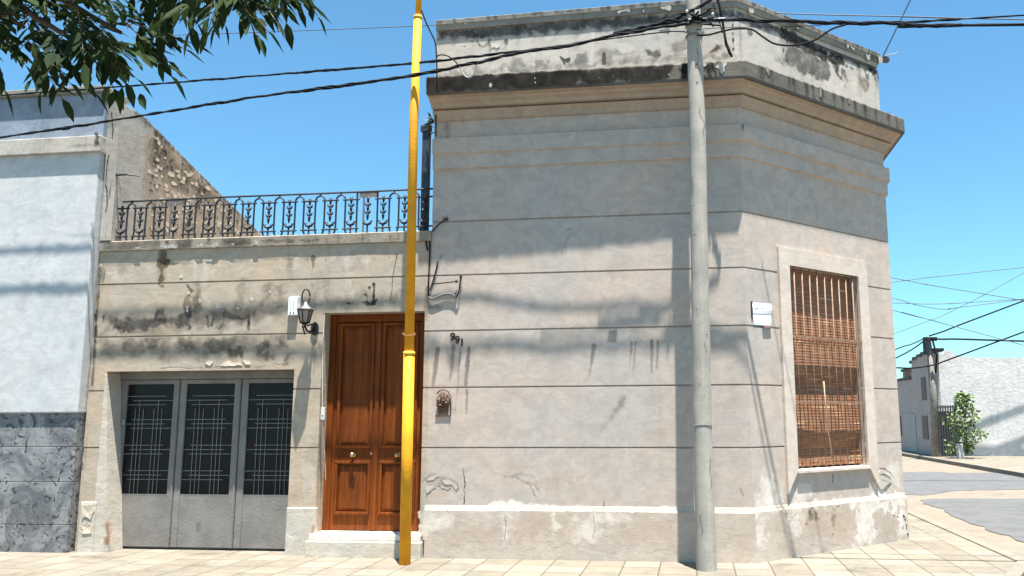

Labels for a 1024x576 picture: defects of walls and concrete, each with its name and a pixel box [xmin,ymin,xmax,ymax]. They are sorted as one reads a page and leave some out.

water stain [426,29,688,92]
water stain [780,27,866,108]
peeling [135,128,261,249]
water stain [157,239,219,303]
water stain [339,249,377,306]
water stain [92,267,191,383]
water stain [206,311,254,327]
crack [424,470,466,504]